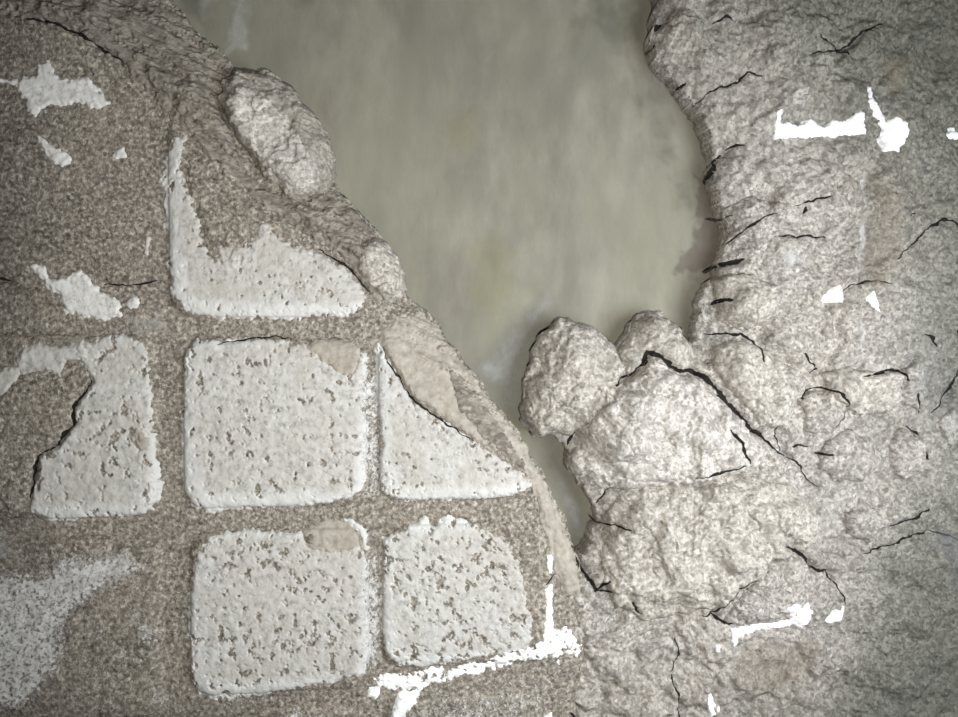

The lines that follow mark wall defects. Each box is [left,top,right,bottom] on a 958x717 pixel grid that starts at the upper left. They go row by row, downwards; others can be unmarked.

spalling [0,0,383,322]
peeling [773,86,910,152]
peeling [946,127,958,140]
crack [703,196,832,274]
crack [30,380,93,498]
crack [383,347,474,441]
crack [616,327,834,487]
crack [864,368,958,460]
peeling [179,310,583,717]
peeling [731,603,813,648]
crack [787,546,846,604]
peeling [825,606,844,624]